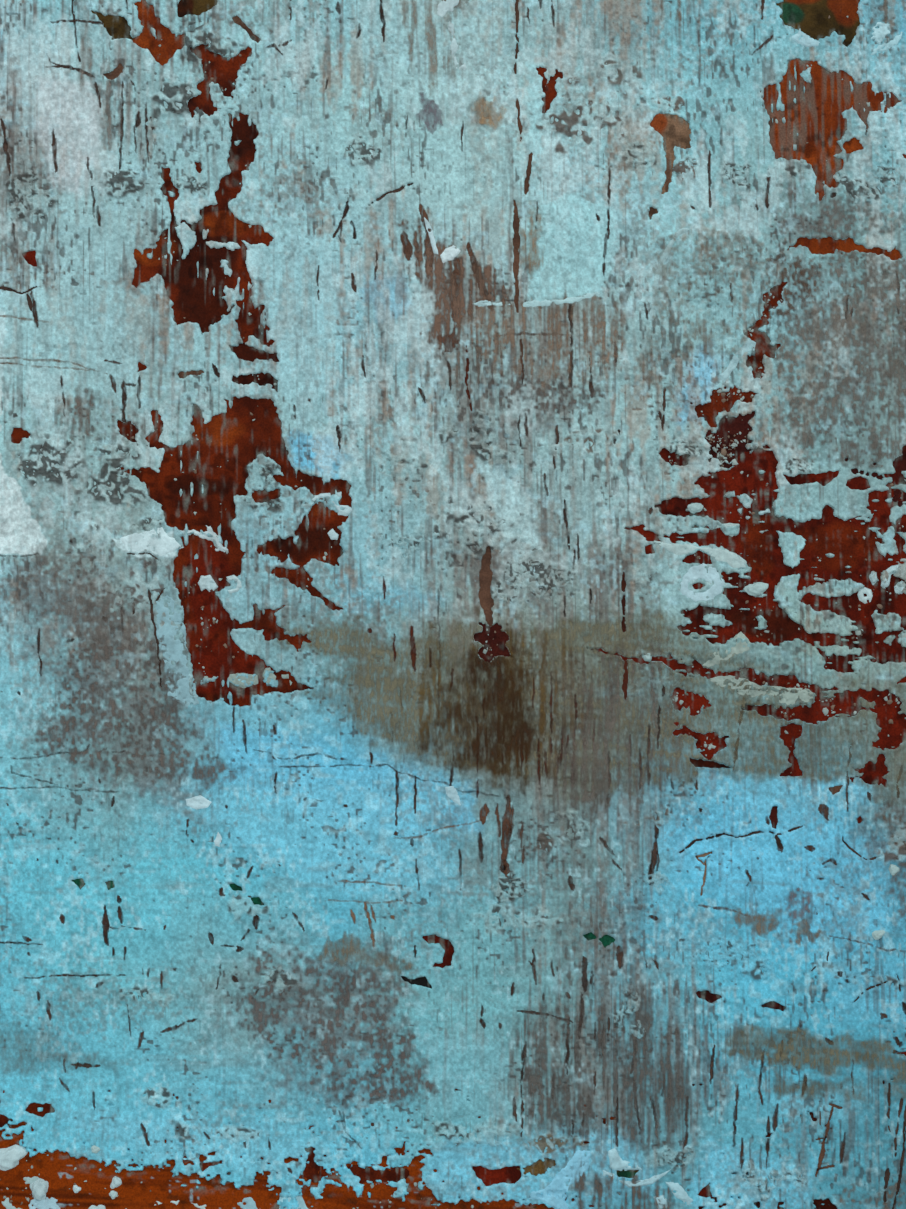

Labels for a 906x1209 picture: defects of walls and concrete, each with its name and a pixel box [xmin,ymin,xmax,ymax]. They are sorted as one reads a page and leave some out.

peeling [505,7,710,194]
peeling [716,58,906,206]
peeling [776,0,860,47]
peeling [788,236,902,260]
peeling [0,0,512,708]
peeling [370,494,592,662]
peeling [587,282,906,795]
water stain [278,596,862,885]
peeling [0,1084,837,1209]